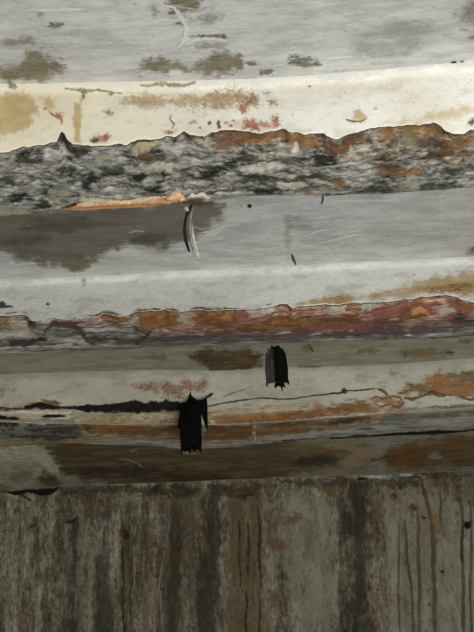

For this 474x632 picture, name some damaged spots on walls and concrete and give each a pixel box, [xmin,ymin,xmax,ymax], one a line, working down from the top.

damp [0,51,66,83]
damp [140,51,275,78]
damp [287,53,321,69]
corrosion [237,93,281,133]
spalling [0,93,474,258]
damp [0,202,225,272]
corrosion [371,272,474,299]
peeling [0,409,76,420]
corrosion [70,409,180,440]
crack [208,386,387,407]
corrosion [202,368,474,441]
damp [458,488,473,632]